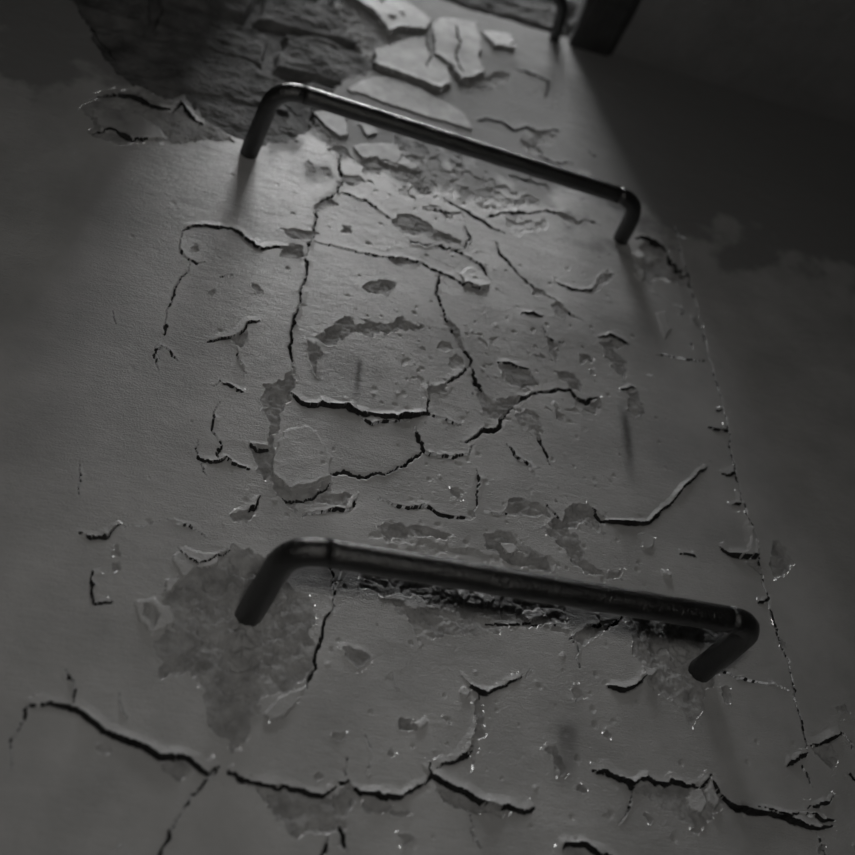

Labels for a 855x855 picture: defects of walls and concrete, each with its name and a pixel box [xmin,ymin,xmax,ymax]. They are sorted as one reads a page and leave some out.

flaking render [71,0,553,141]
peeling [262,102,466,196]
crack [152,153,614,520]
spalling [483,463,708,581]
spalling [135,542,356,855]
spalling [358,573,567,640]
spalling [606,617,724,727]
crack [721,670,770,704]
crack [757,557,807,744]
spalling [555,834,619,855]
peeling [590,759,724,836]
crack [712,774,835,855]